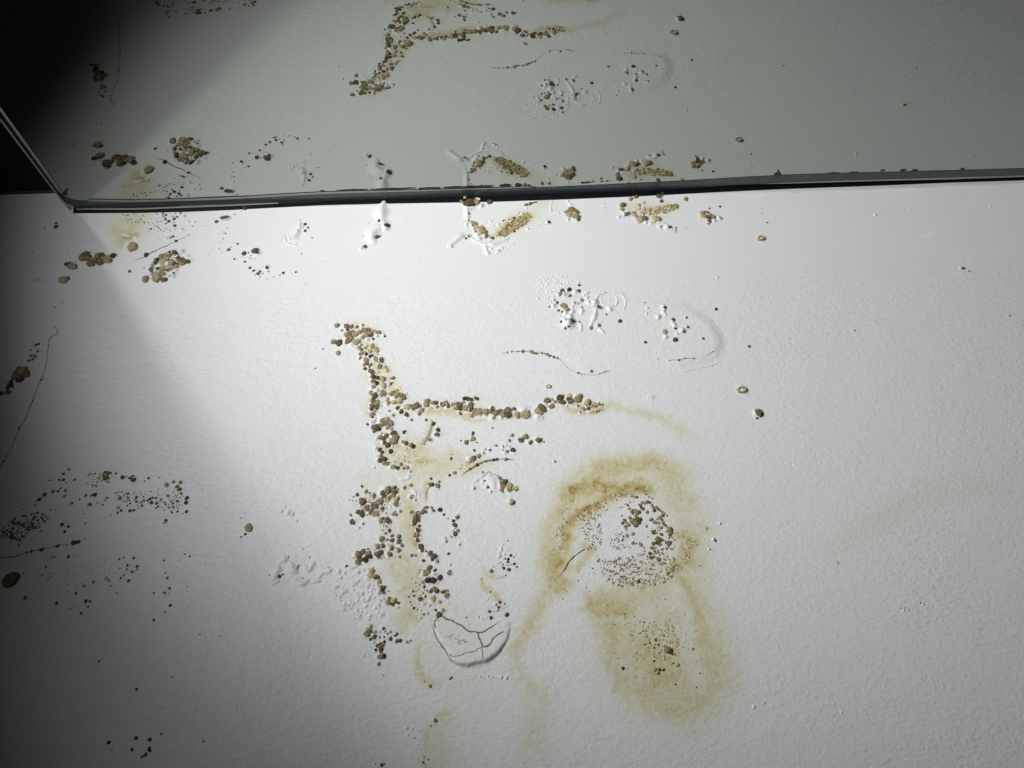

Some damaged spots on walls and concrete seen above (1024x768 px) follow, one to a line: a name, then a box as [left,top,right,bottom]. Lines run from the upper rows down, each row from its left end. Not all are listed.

crack [0,326,58,467]
crack [503,349,609,375]
damp [331,313,762,768]